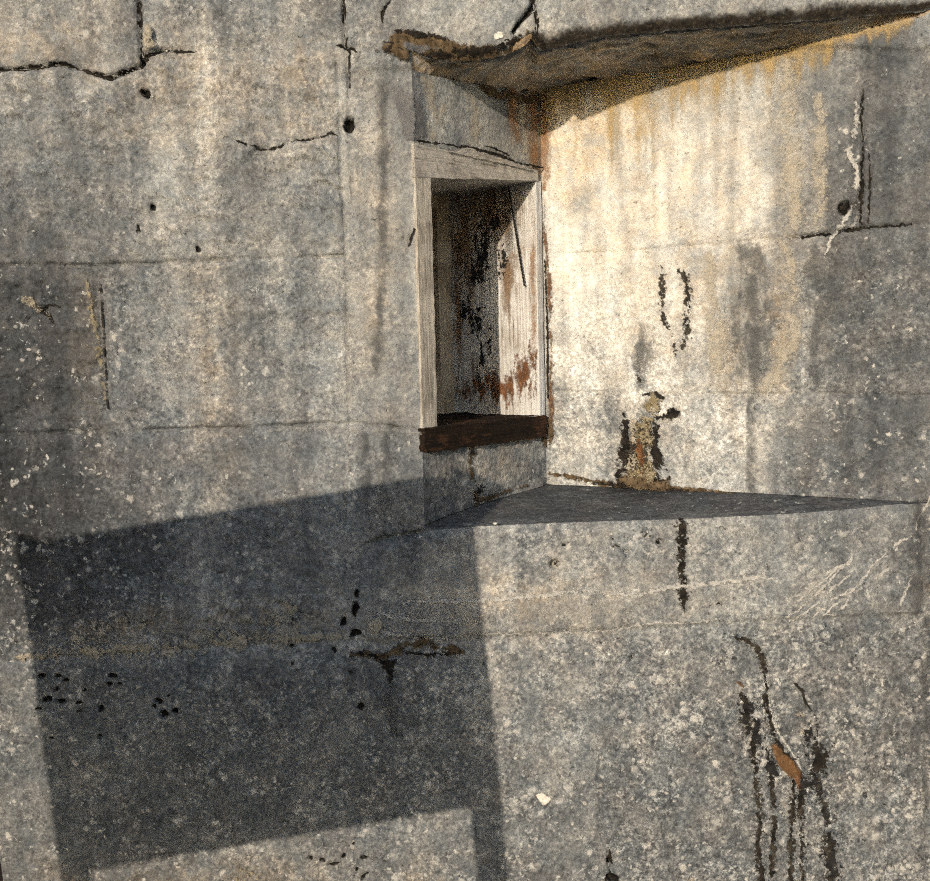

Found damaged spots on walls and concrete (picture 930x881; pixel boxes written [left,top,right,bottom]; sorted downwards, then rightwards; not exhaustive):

crack [0,1,196,81]
crack [235,131,337,151]
leakage [530,1,930,303]
corrosion [455,205,554,447]
leakage [658,265,694,355]
leakage [704,247,819,396]
leakage [547,332,735,494]
leakage [468,446,528,506]
leakage [365,517,775,639]
leakage [350,650,461,737]
leakage [734,633,844,881]